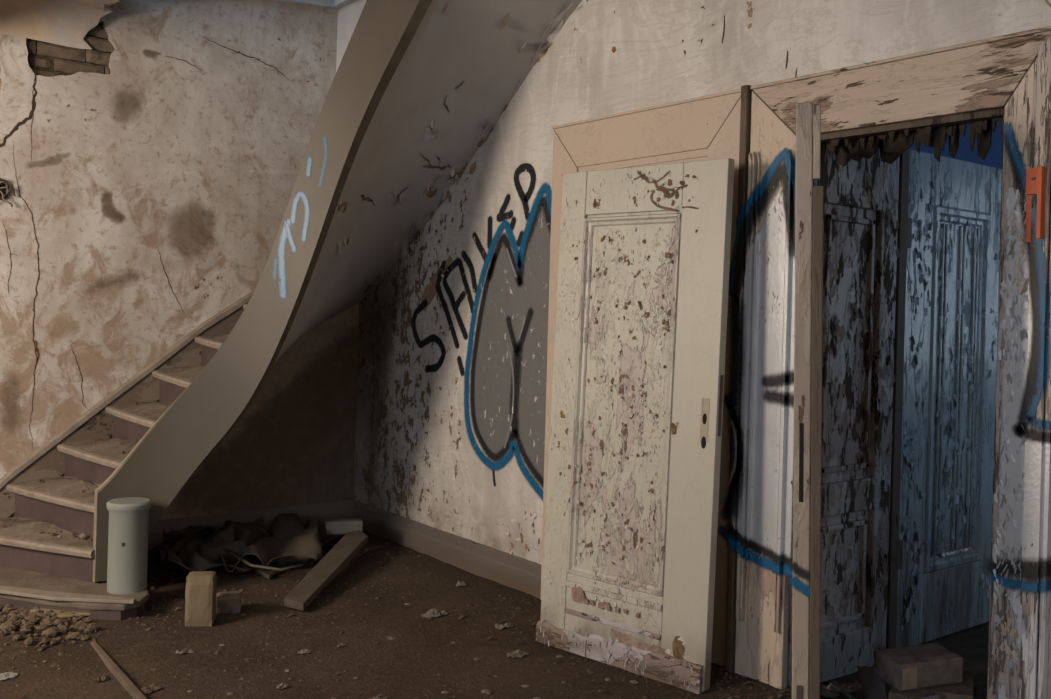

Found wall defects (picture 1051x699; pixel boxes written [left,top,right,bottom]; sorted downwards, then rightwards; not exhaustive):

flaking render [26,0,120,77]
peeling [519,3,577,85]
crack [0,53,40,452]
peeling [364,162,478,294]